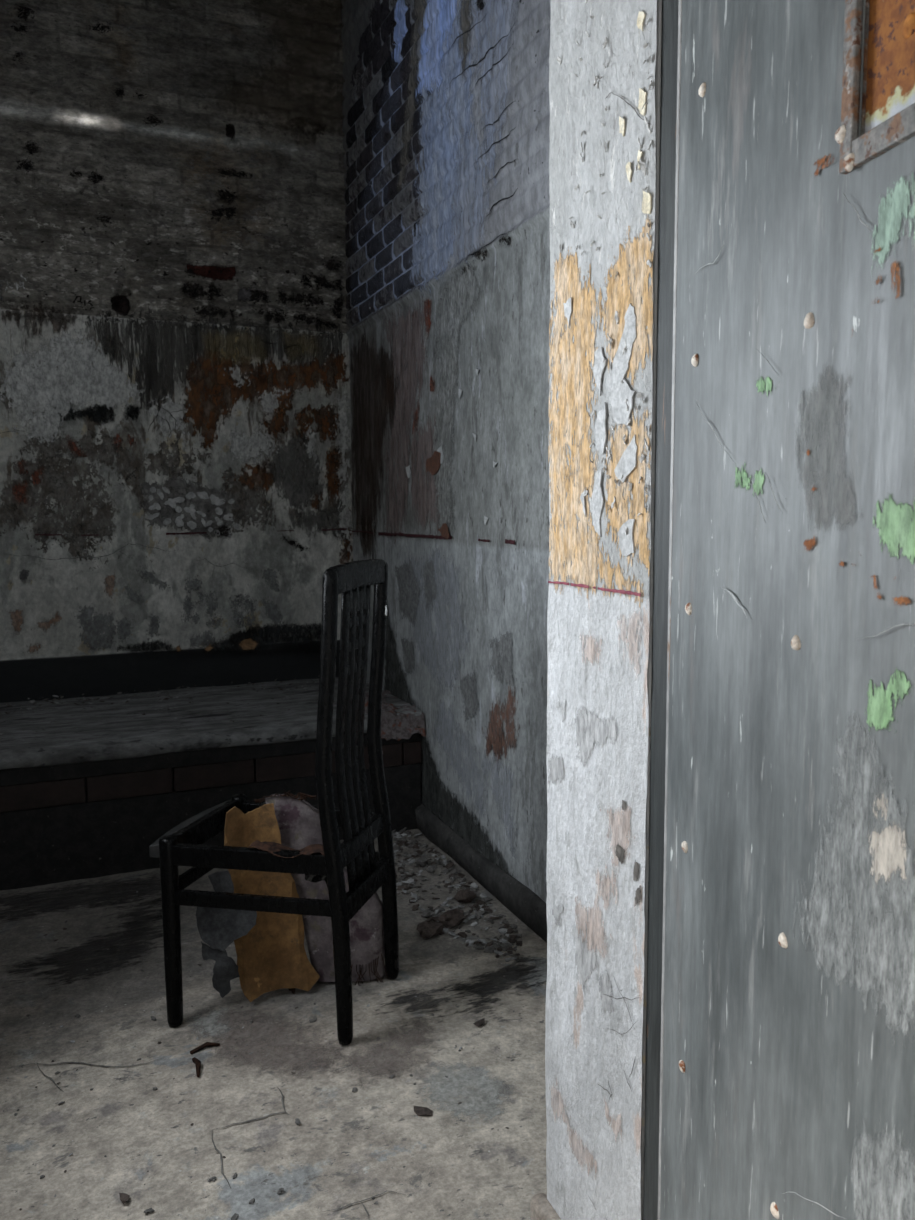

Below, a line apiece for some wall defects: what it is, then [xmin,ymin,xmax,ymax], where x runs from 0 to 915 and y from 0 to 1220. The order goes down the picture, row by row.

leakage [2,0,513,412]
flaking render [179,0,435,329]
crack [444,15,516,90]
crack [456,101,518,264]
peeling [548,11,653,607]
corrosion [814,154,834,178]
peeling [0,325,311,650]
corrosion [179,331,420,564]
peeling [303,377,354,545]